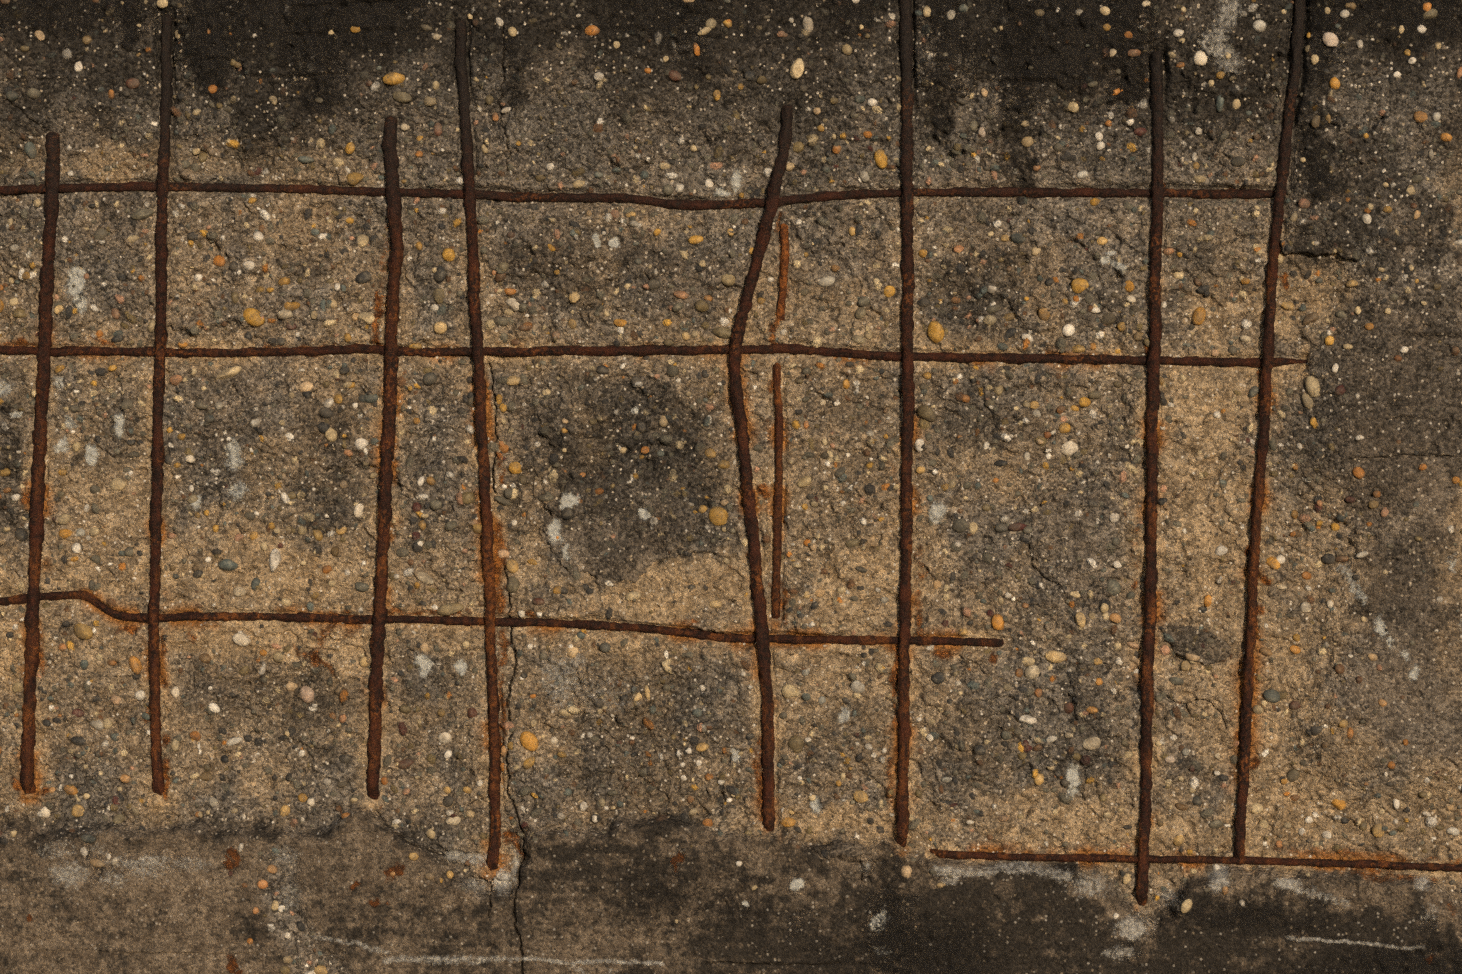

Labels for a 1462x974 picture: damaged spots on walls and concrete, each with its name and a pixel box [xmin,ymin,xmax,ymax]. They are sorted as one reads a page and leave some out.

spalling [0,7,486,617]
damp [174,0,462,118]
corrosion [371,225,389,346]
damp [916,0,1171,201]
spalling [911,0,1295,358]
damp [1295,0,1462,203]
crack [489,363,498,492]
spalling [1098,0,1462,928]
corrosion [296,610,360,672]
corrosion [494,523,511,746]
spalling [0,354,1148,896]
crack [488,563,525,974]